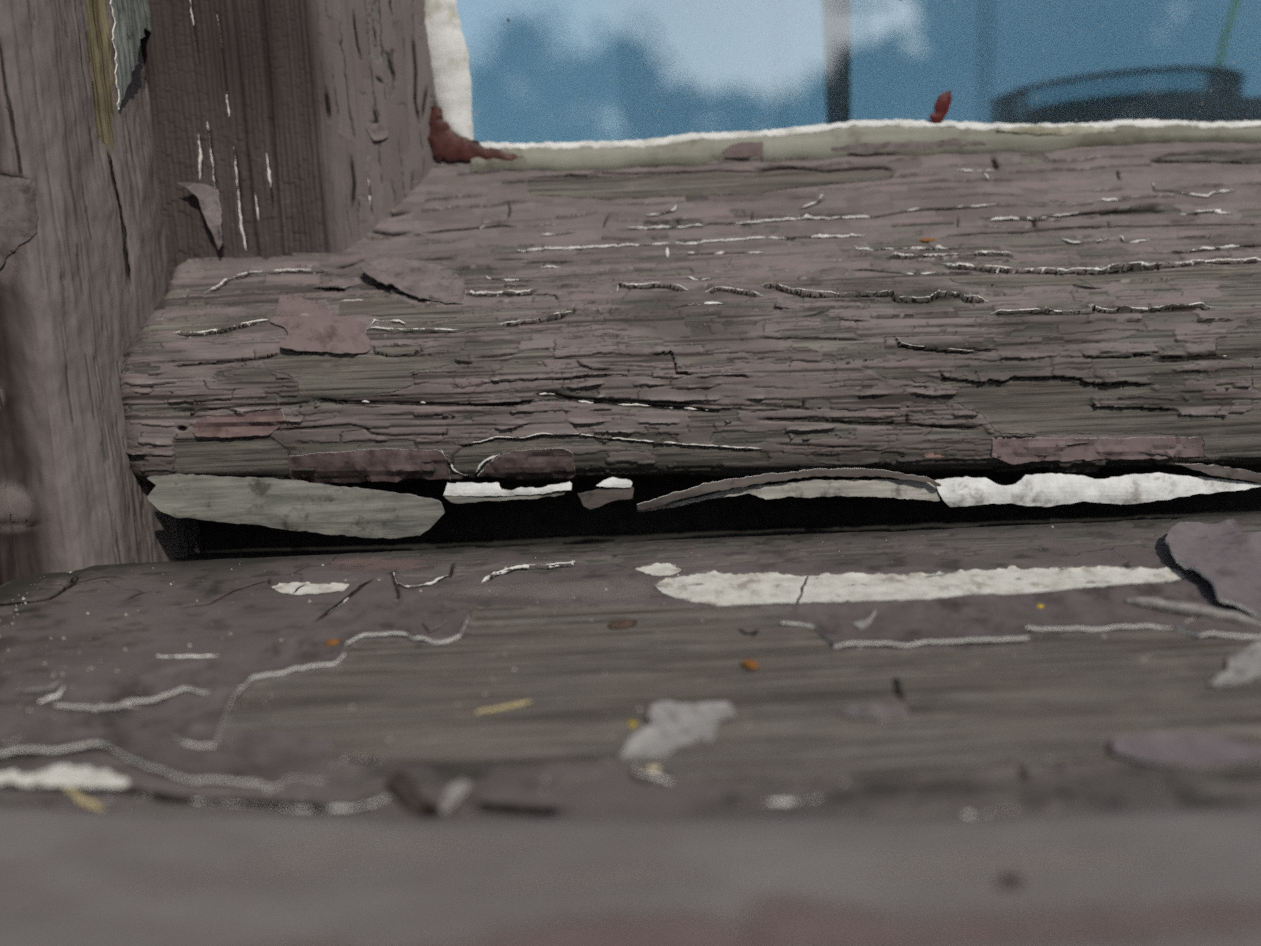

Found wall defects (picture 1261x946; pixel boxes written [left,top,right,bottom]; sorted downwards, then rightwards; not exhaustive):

peeling [85,0,152,155]
crack [353,0,427,123]
peeling [0,176,39,268]
peeling [177,182,222,250]
peeling [759,171,892,192]
peeling [831,138,985,155]
peeling [173,257,575,397]
peeling [617,282,688,291]
peeling [705,282,1214,316]
peeling [882,251,1261,288]
peeling [174,368,1261,512]
peeling [0,519,1261,789]